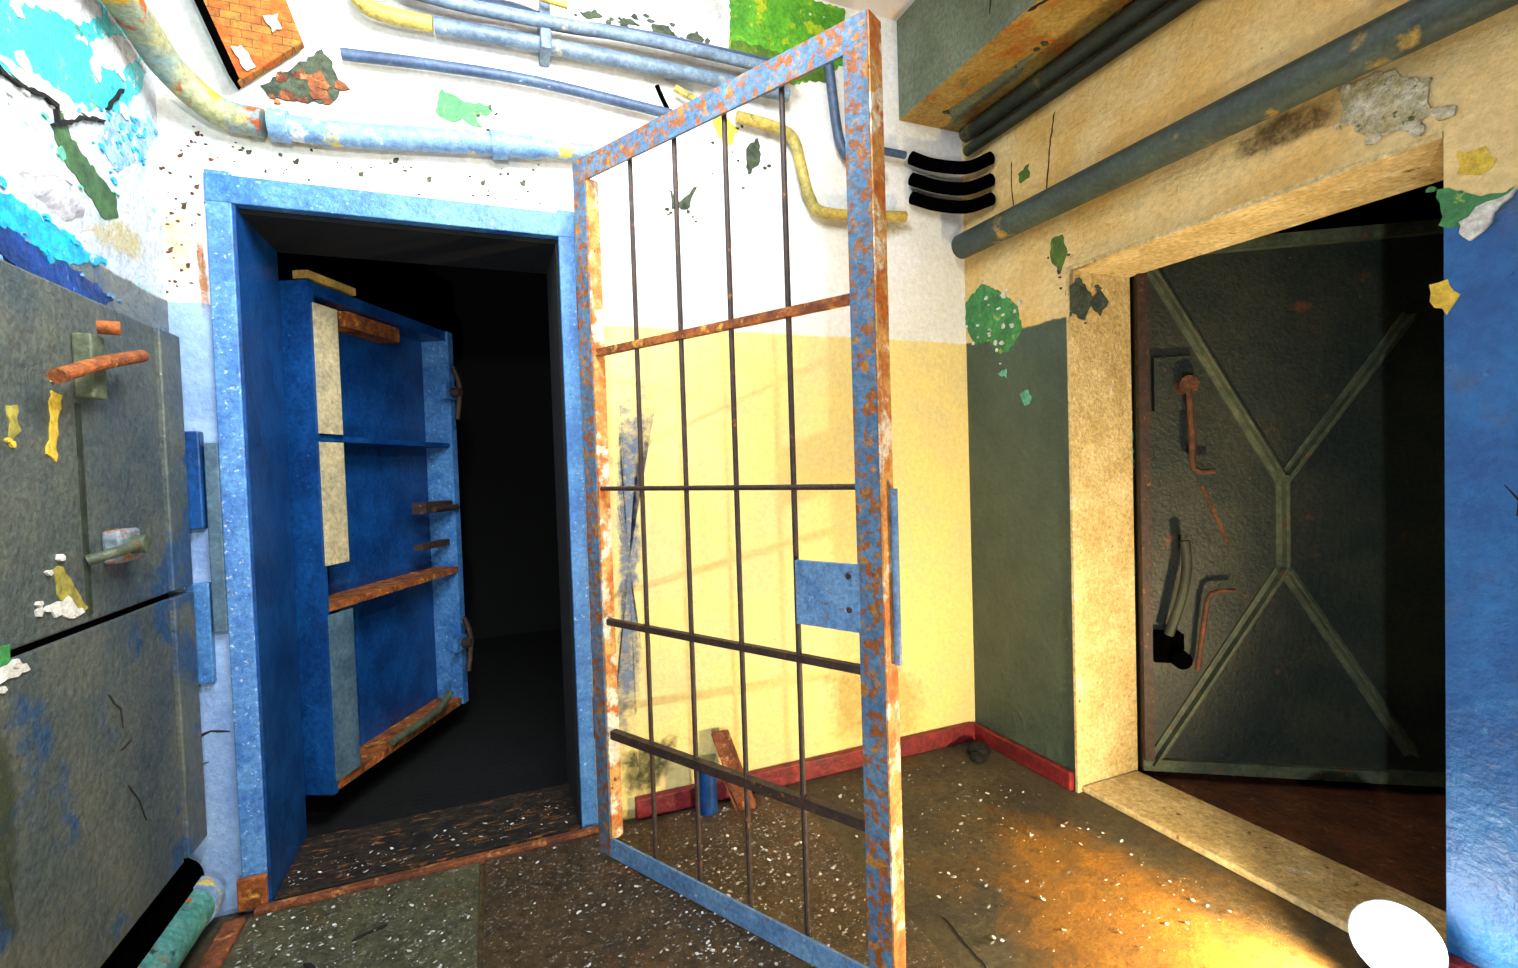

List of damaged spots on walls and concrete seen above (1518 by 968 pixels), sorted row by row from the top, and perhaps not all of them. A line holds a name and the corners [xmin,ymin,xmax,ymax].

crack [0,64,125,126]
peeling [0,0,262,226]
peeling [435,89,498,131]
spalling [337,158,432,196]
spalling [468,164,541,204]
peeling [0,175,122,306]
spalling [166,243,199,293]
peeling [964,280,1022,378]
peeling [1020,390,1032,406]